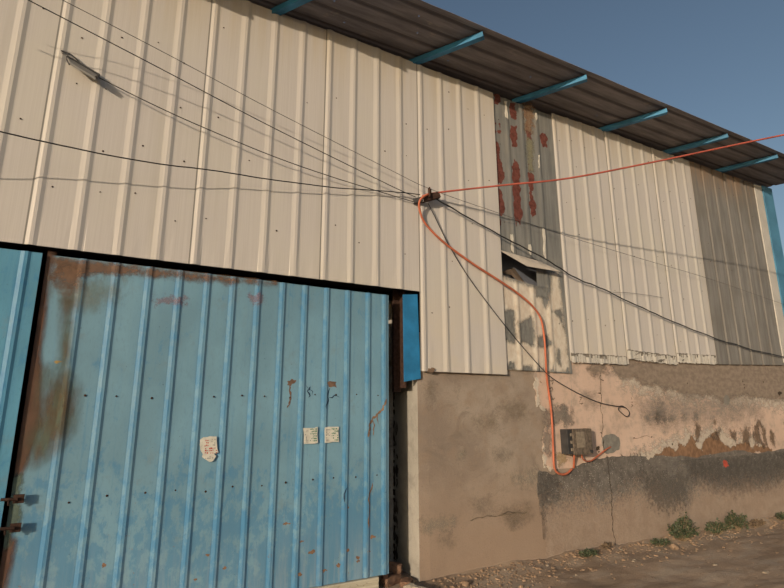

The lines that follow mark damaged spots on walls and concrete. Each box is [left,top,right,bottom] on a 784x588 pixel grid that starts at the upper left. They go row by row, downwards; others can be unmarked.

rust [493,94,548,227]
rust [0,252,259,588]
crack [470,511,527,521]
crack [599,373,641,544]
peeling [502,272,784,472]